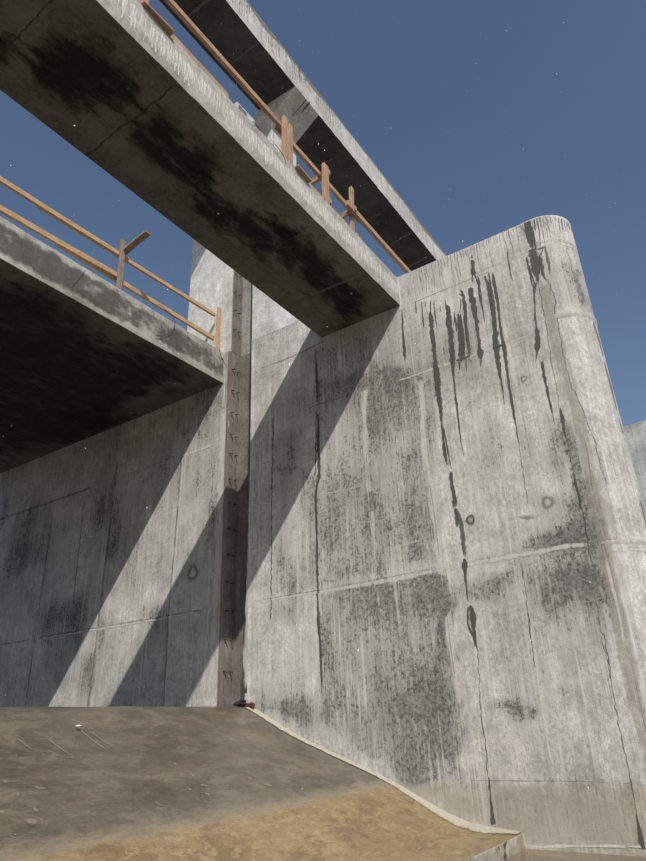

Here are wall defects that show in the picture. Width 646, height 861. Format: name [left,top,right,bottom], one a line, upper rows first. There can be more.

leakage [23,34,364,326]
leakage [0,282,185,454]
leakage [0,224,223,374]
leakage [114,0,576,650]
crack [308,349,325,693]
crack [477,654,490,791]
crack [596,603,637,811]